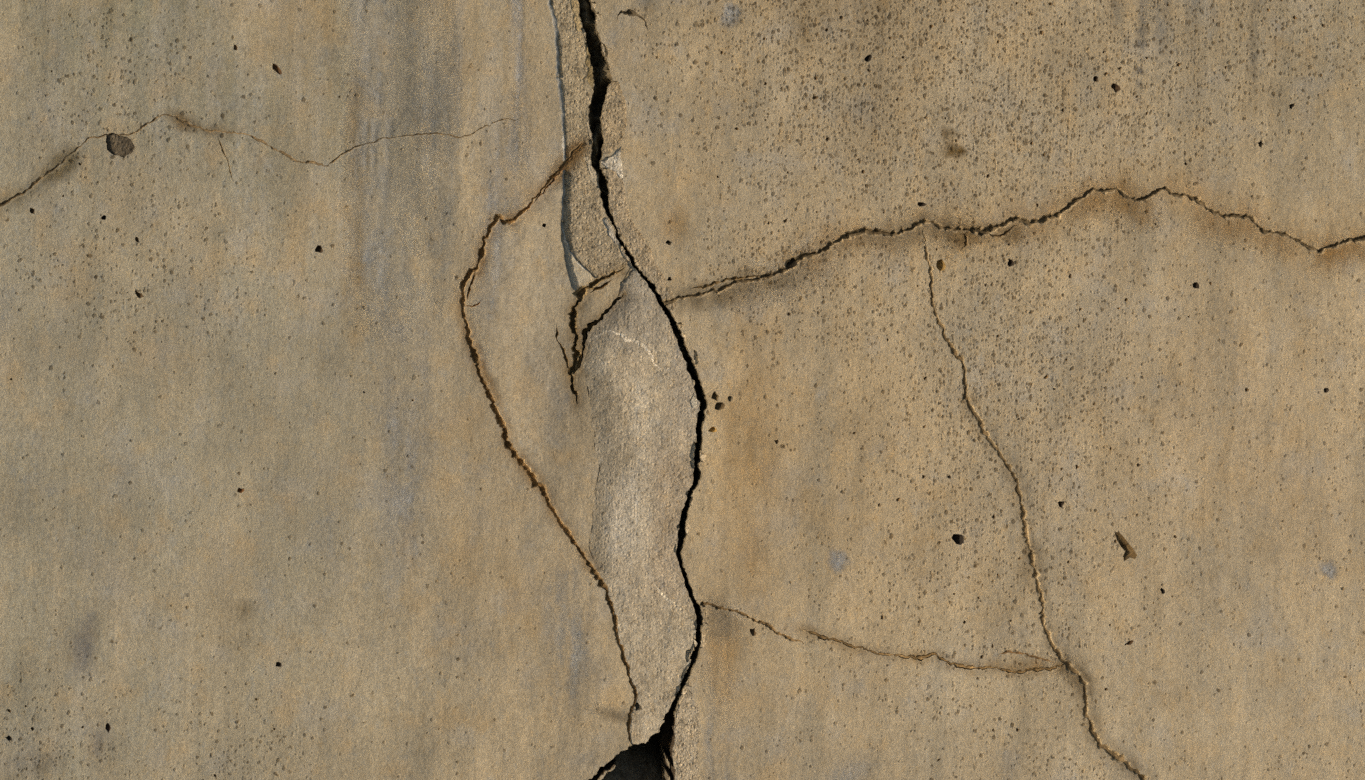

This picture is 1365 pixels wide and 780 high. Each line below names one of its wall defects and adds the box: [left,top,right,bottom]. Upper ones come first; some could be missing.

crack [0,114,518,207]
spalling [547,0,700,780]
crack [459,0,1365,780]